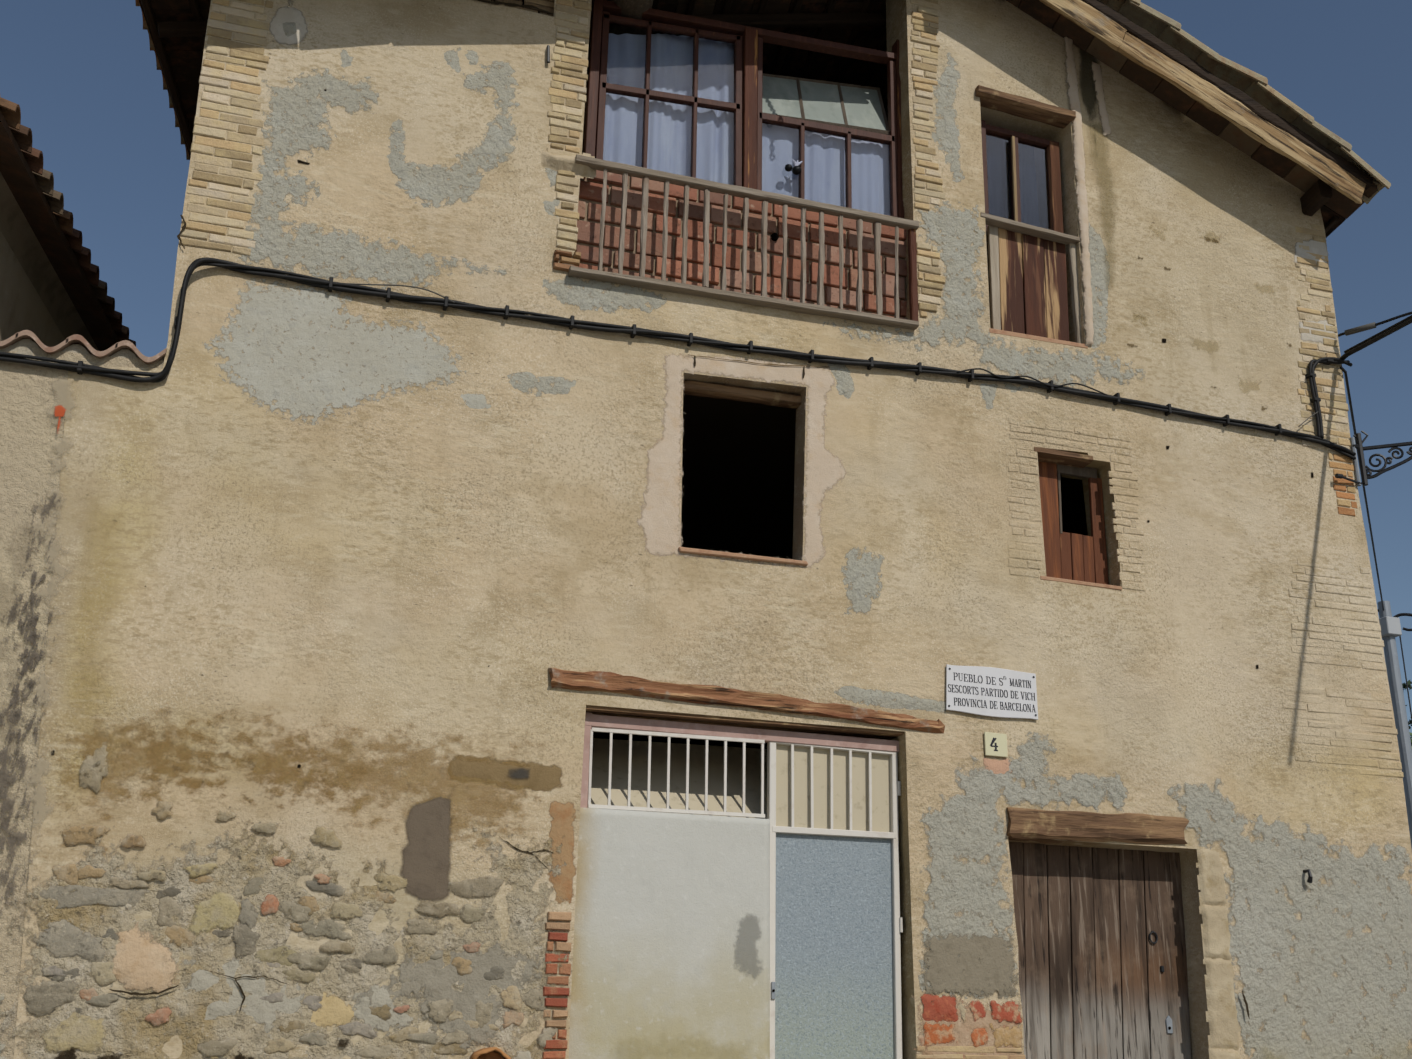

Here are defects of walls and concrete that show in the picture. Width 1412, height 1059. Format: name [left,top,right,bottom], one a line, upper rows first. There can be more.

peeling [444,47,481,73]
peeling [387,119,408,179]
damp [0,489,68,913]
damp [510,768,529,778]
spalling [983,758,1012,774]